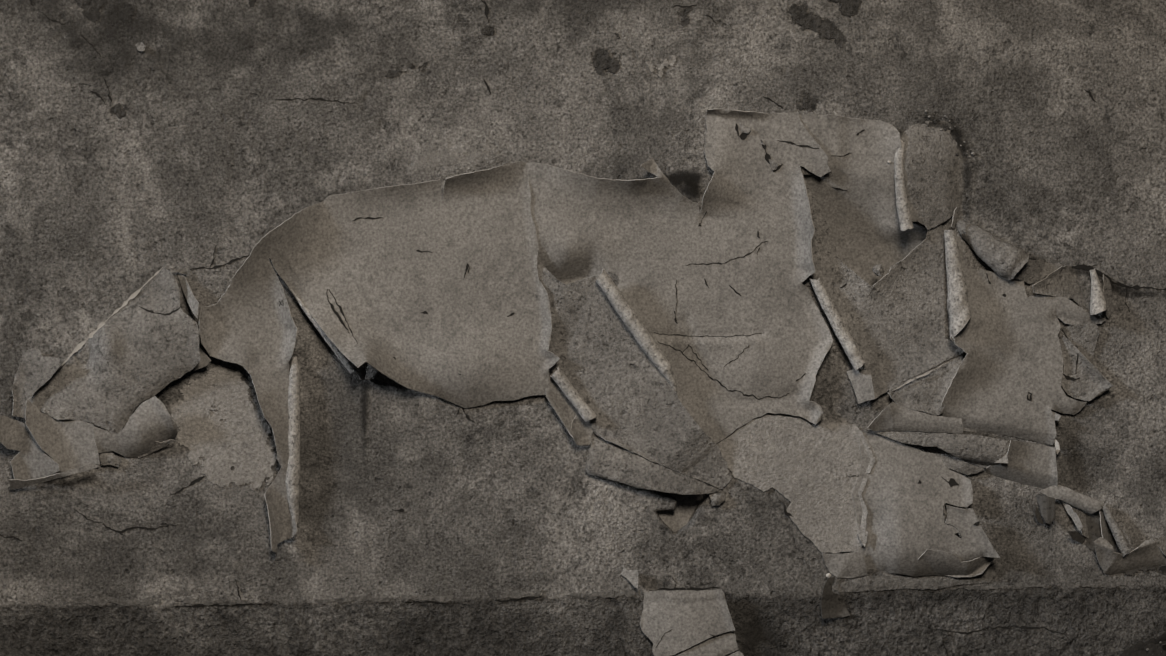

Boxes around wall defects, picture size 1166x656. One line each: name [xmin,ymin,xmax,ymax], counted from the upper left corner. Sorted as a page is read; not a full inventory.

spalling [110,103,129,119]
spalling [796,92,819,112]
peeling [0,109,1166,619]
peeling [621,567,744,656]